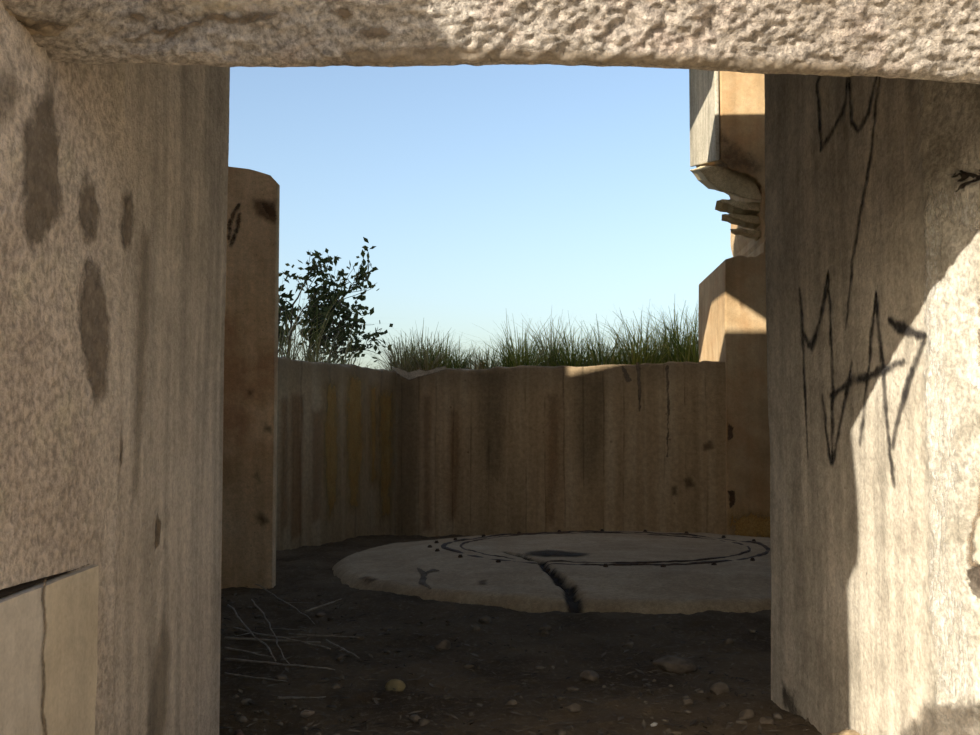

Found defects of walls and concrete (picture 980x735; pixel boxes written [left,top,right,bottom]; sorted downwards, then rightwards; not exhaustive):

leakage [24,98,62,243]
leakage [80,177,100,239]
leakage [122,195,133,249]
crack [952,170,980,192]
leakage [79,261,110,401]
peeling [924,190,980,696]
crack [517,556,581,613]
crack [0,564,89,735]
leakage [901,702,980,735]